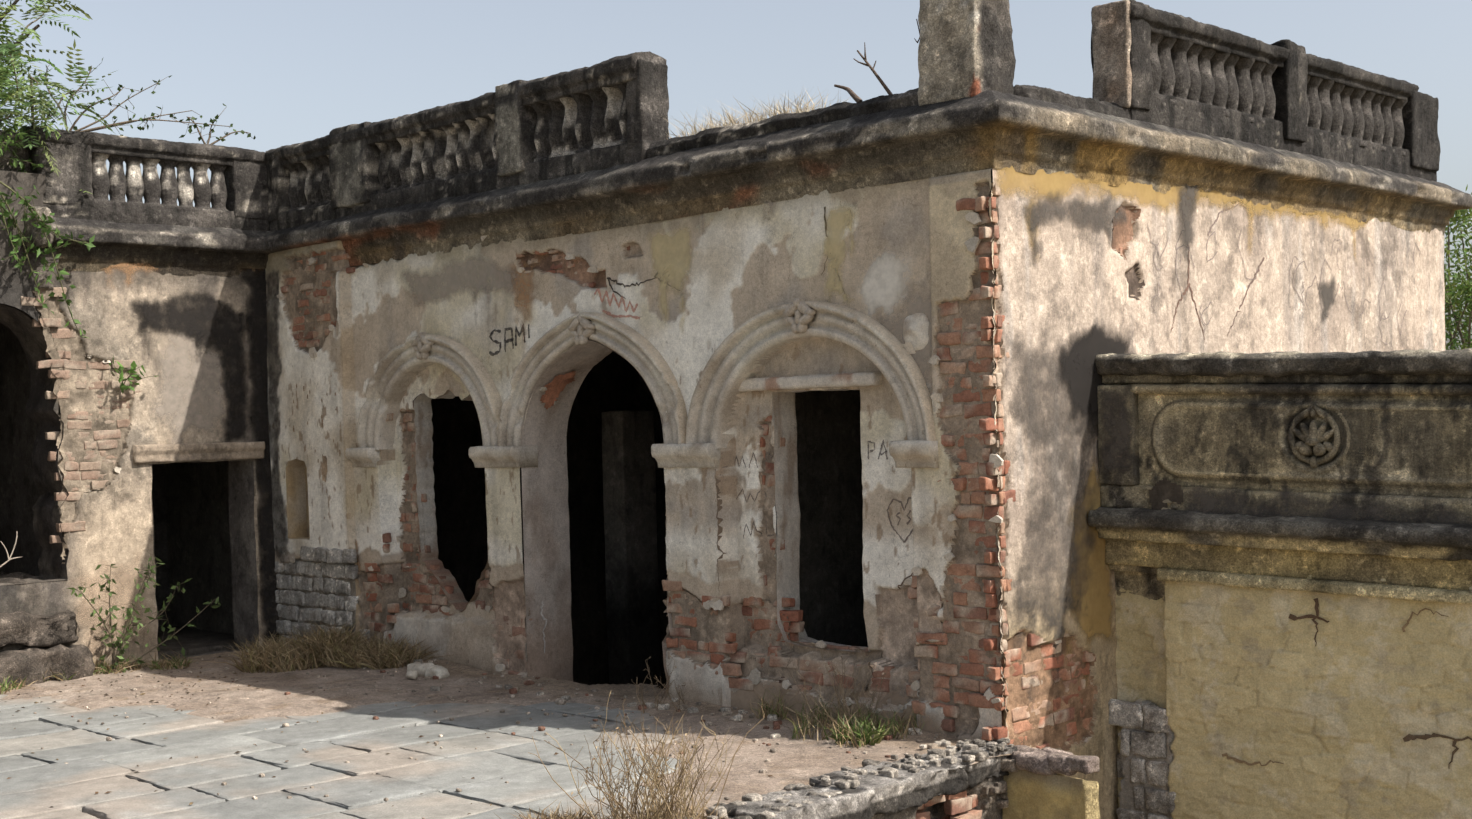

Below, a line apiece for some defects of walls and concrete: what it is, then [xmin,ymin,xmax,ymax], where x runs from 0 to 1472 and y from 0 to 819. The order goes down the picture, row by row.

damp [999,166,1365,262]
spalling [277,247,402,358]
spalling [516,249,607,288]
damp [1319,279,1335,320]
damp [133,268,288,644]
peeling [293,375,341,482]
spalling [275,402,455,646]
spalling [662,182,1176,819]
crack [1289,598,1330,646]
crack [1403,733,1472,764]